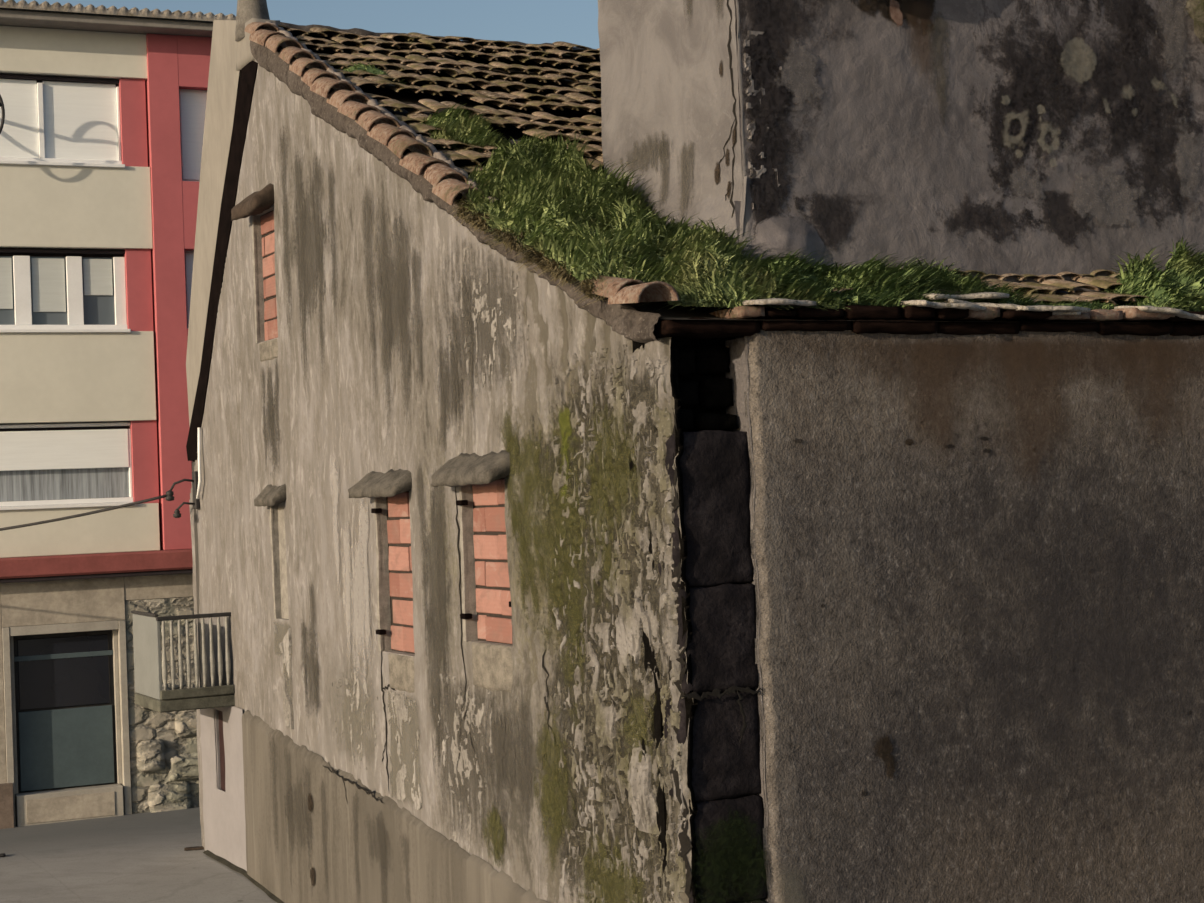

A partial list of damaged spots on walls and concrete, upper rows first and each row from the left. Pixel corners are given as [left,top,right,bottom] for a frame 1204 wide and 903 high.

leakage [261,363,279,472]
leakage [280,132,336,368]
leakage [363,194,421,404]
leakage [438,285,474,459]
flaking render [438,245,529,388]
crack [719,0,737,242]
leakage [743,58,860,250]
spalling [853,0,949,117]
leakage [930,78,1092,248]
flaking render [532,344,686,903]
crack [323,651,395,803]
flaking render [331,667,494,842]